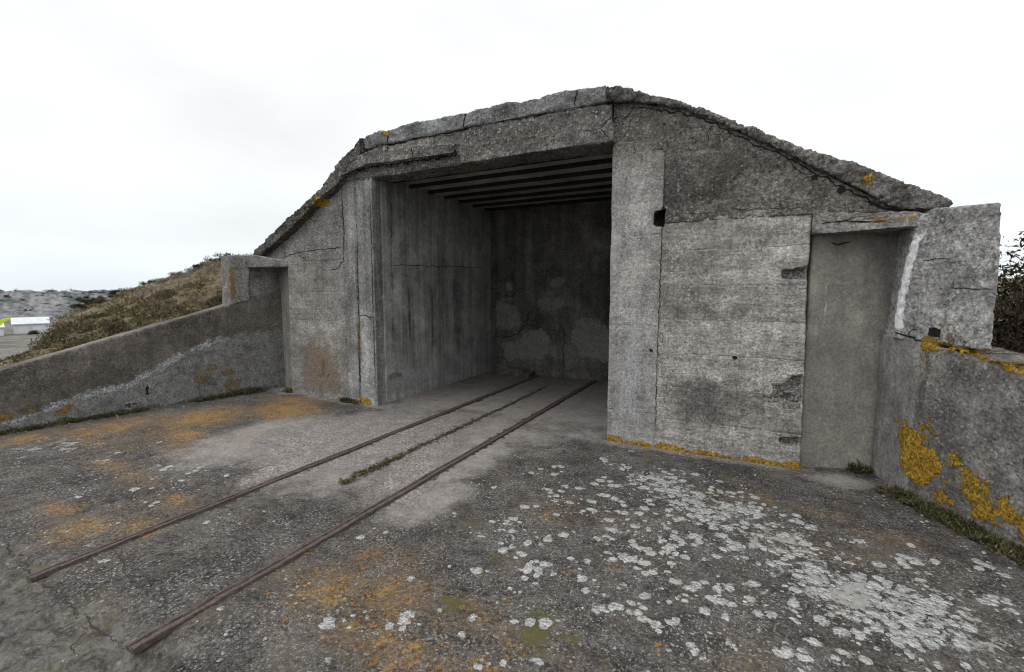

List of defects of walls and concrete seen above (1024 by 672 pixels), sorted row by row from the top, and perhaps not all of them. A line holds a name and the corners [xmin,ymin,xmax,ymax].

crack [266,90,933,431]
spalling [762,373,803,410]